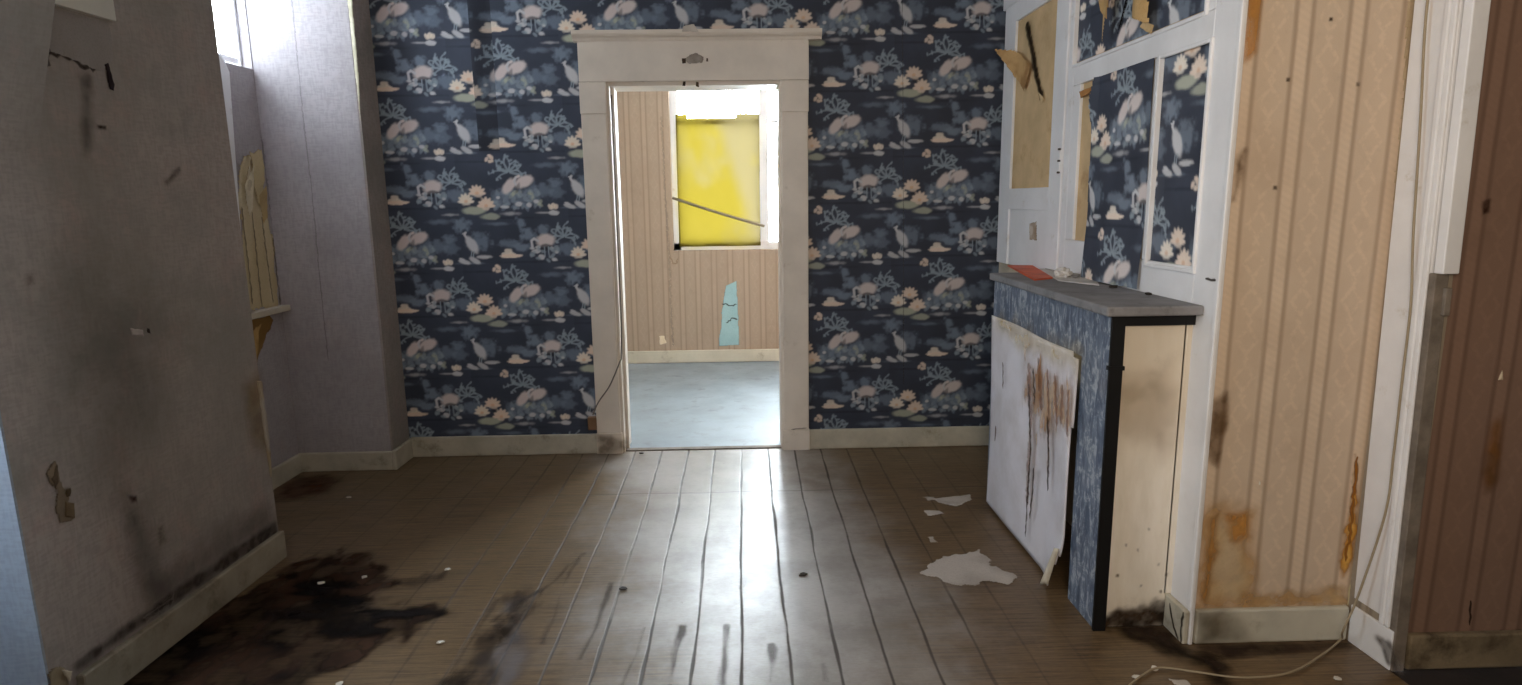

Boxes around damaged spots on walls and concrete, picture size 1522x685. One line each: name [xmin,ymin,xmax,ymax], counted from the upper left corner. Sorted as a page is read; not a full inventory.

peeling [51,464,75,518]
leakage [79,527,277,665]